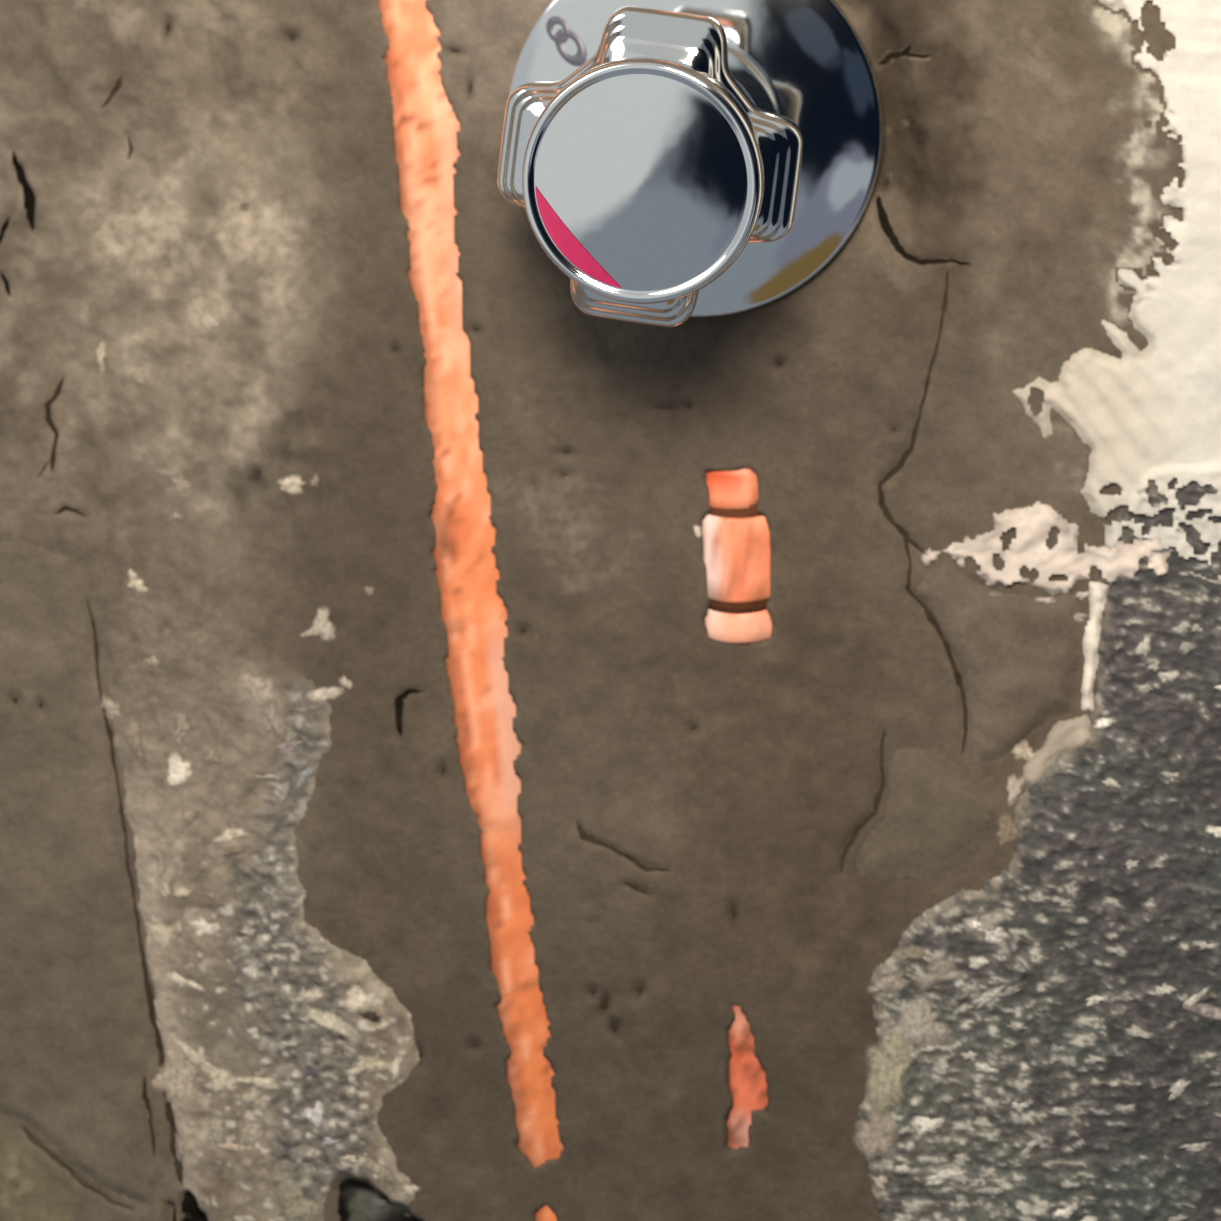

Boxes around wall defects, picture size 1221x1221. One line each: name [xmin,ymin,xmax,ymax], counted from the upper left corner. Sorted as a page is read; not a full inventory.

crack [878,43,932,65]
crack [0,151,36,242]
crack [0,271,10,296]
crack [38,377,63,477]
crack [876,195,971,755]
crack [394,688,424,737]
crack [86,598,183,1184]
peeling [101,549,422,1221]
crack [576,822,670,895]
spalling [856,477,1221,1221]